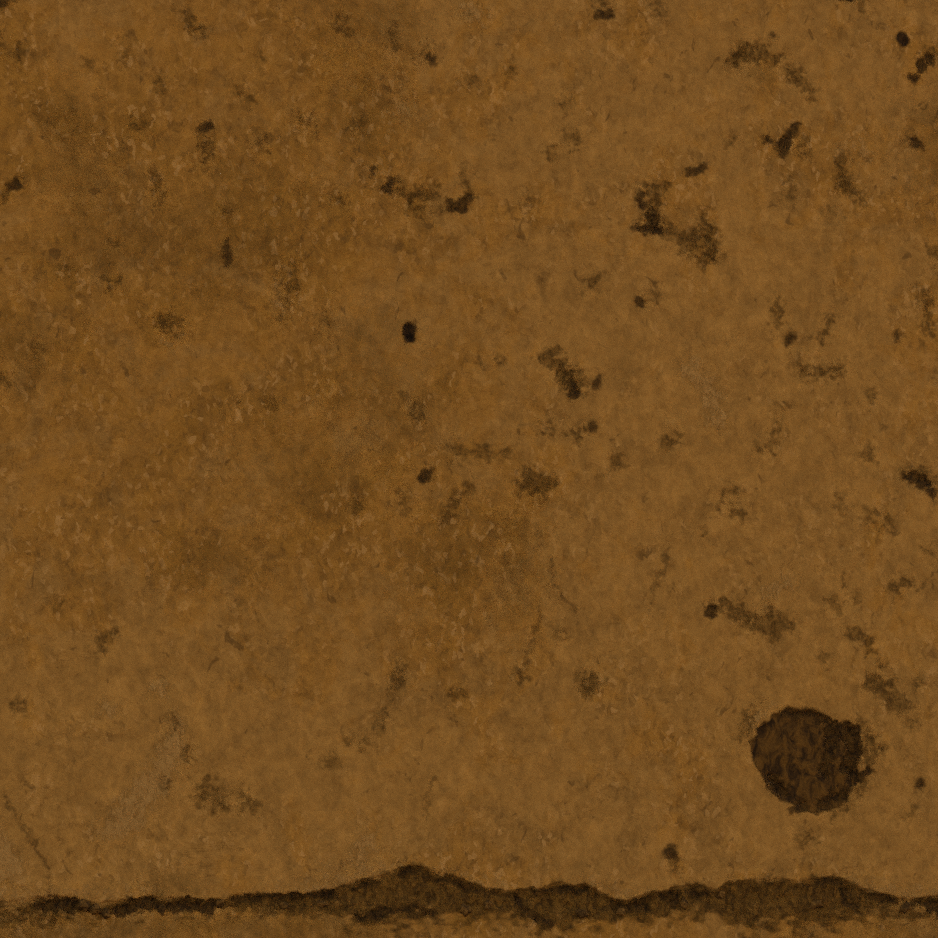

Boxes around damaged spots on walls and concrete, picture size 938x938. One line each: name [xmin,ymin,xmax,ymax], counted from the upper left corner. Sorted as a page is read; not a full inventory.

peeling [790,799,809,814]
crack [0,865,938,938]